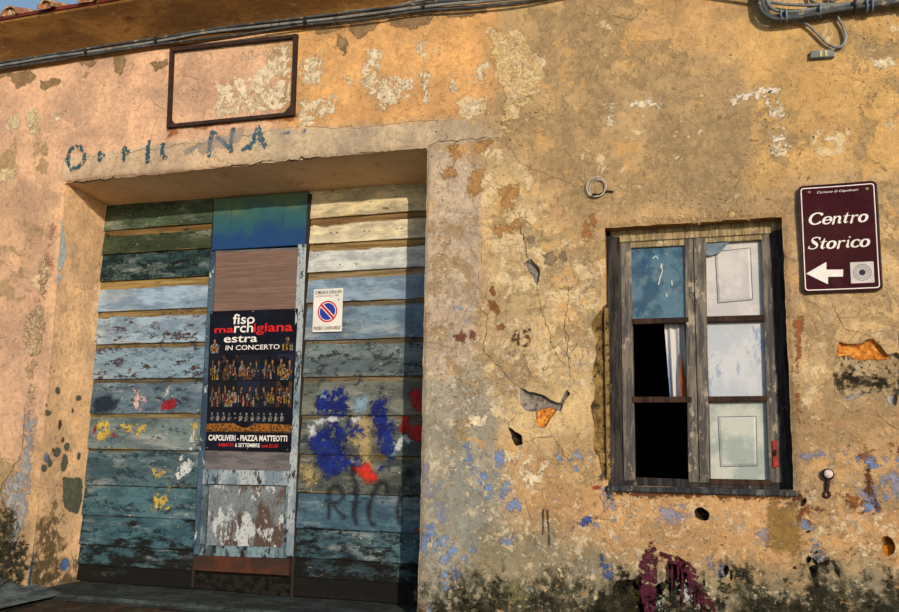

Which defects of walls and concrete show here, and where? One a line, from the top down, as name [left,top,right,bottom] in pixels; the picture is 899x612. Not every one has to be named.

peeling [315,4,487,56]
peeling [211,41,341,126]
peeling [730,86,792,154]
peeling [440,141,462,180]
peeling [466,168,484,198]
peeling [492,184,527,239]
crack [537,279,573,390]
peeling [0,221,83,551]
flaking render [520,388,570,428]
flaking render [833,338,899,406]
water stain [0,500,66,587]
water stain [415,551,899,612]